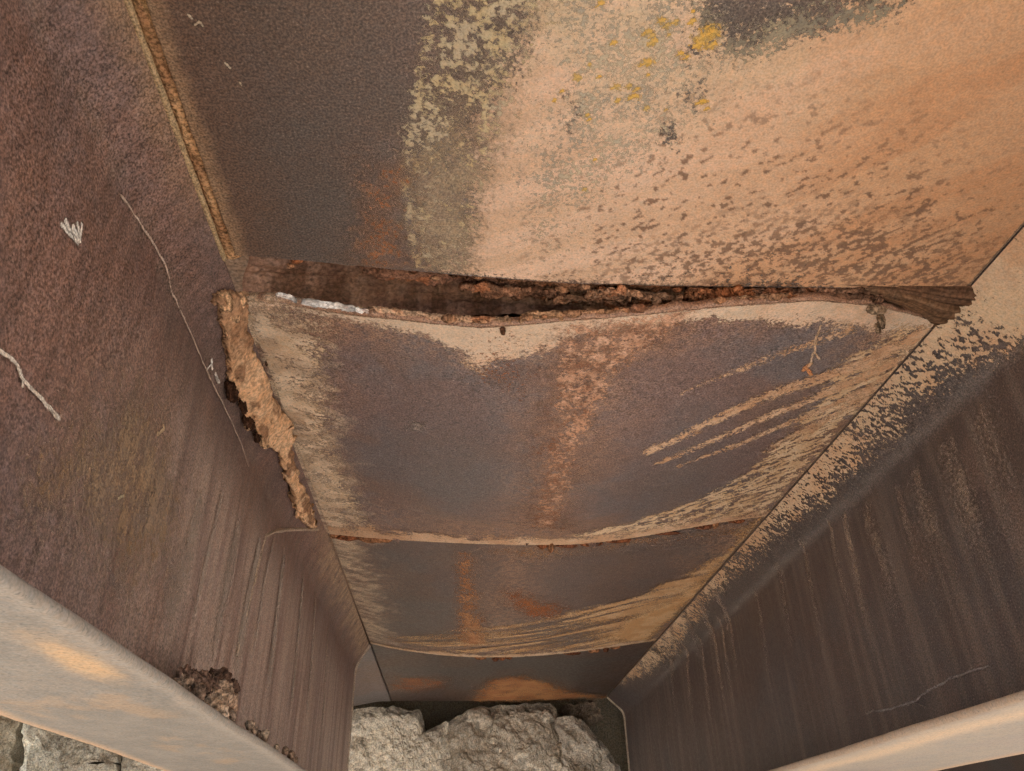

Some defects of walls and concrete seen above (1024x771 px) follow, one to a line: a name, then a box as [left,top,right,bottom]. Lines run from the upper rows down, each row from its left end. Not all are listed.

rust [327,0,1024,685]